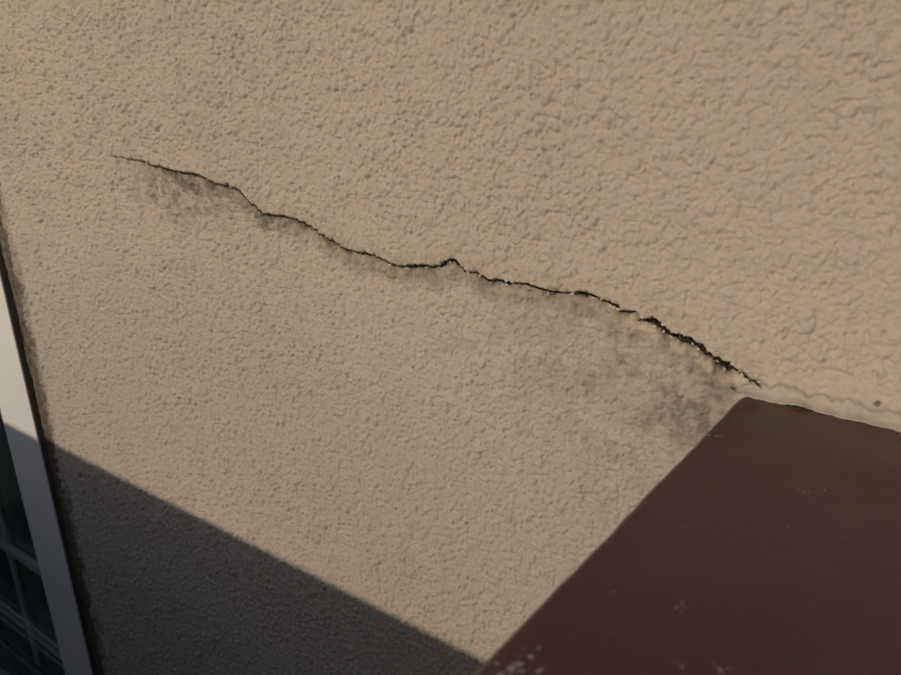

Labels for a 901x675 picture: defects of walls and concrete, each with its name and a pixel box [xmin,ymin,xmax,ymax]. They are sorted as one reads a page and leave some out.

crack [109,156,762,392]